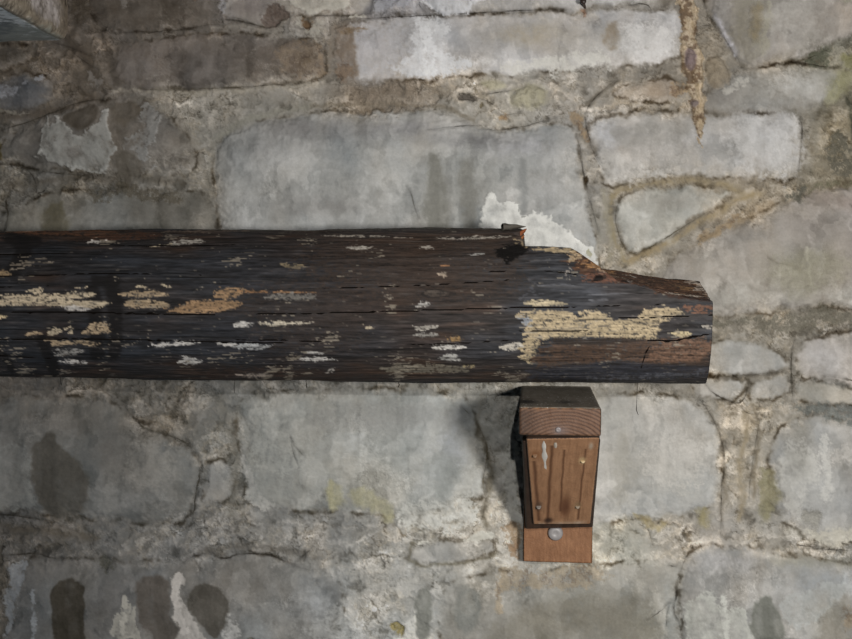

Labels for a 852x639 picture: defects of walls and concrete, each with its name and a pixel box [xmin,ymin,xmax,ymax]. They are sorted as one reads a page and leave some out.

peeling [477,190,599,265]
damp [712,299,852,339]
damp [0,430,92,521]
damp [497,442,524,530]
damp [608,415,719,512]
damp [772,394,852,553]
damp [109,571,242,639]
damp [451,581,671,639]
damp [680,578,852,639]